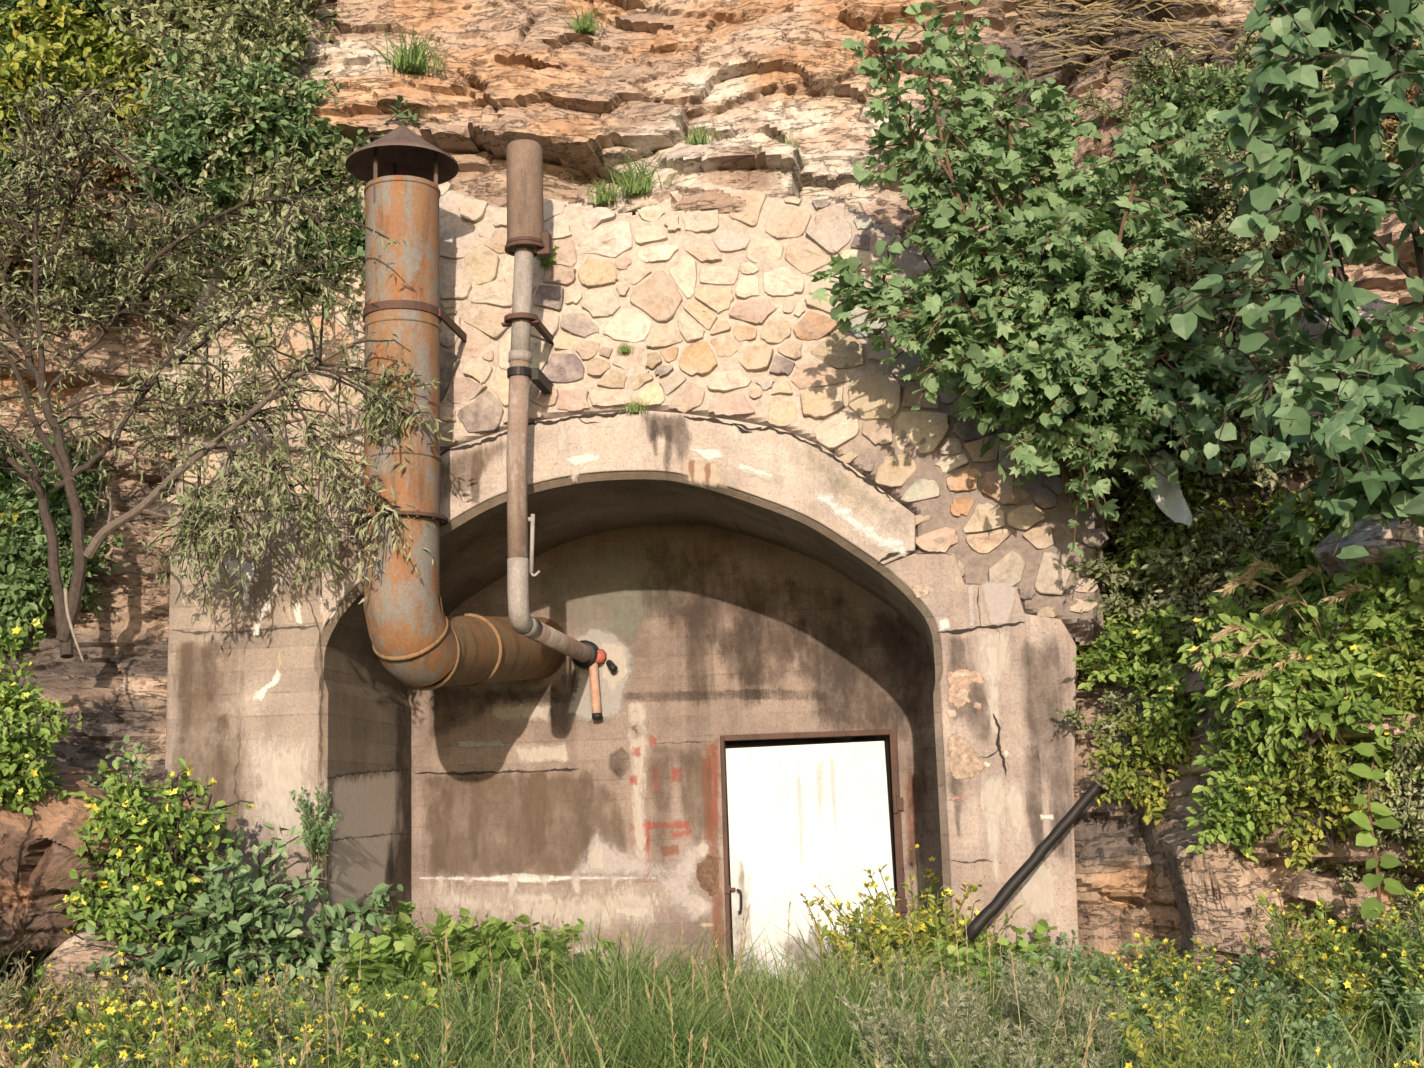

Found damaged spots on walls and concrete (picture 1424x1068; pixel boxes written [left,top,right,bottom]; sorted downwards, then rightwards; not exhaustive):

peeling [253,652,281,701]
peeling [568,628,632,720]
damp [671,561,717,701]
damp [720,581,921,729]
spalling [946,669,1009,801]
crack [980,714,1012,774]